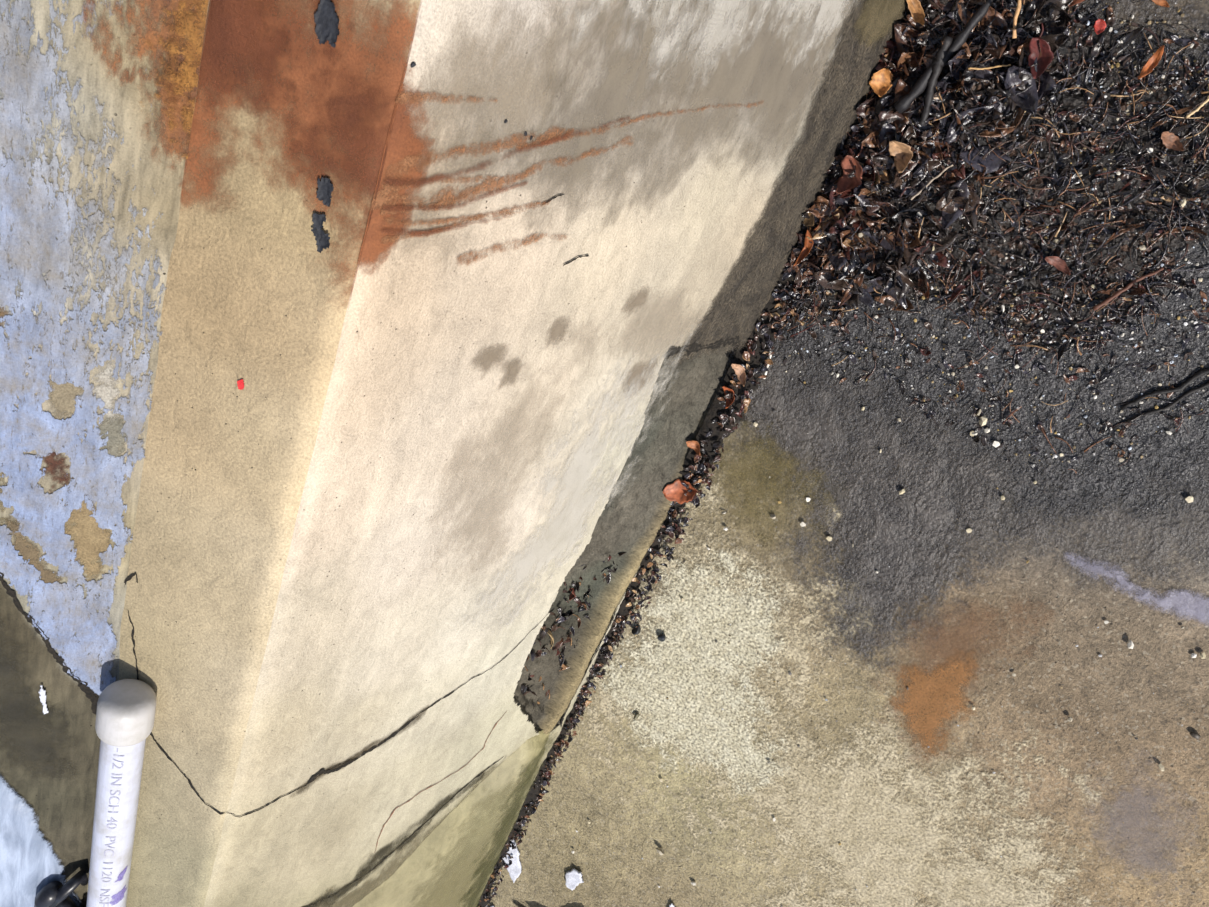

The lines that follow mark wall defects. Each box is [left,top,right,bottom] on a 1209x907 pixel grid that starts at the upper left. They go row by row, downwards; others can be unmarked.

damp [1066,0,1209,77]
rust [84,0,604,293]
peeling [47,362,128,458]
damp [475,347,520,383]
peeling [0,463,61,583]
peeling [42,451,70,494]
peeling [64,494,111,581]
damp [484,361,664,624]
damp [571,236,1209,907]
crack [124,573,139,680]
crack [150,614,548,817]